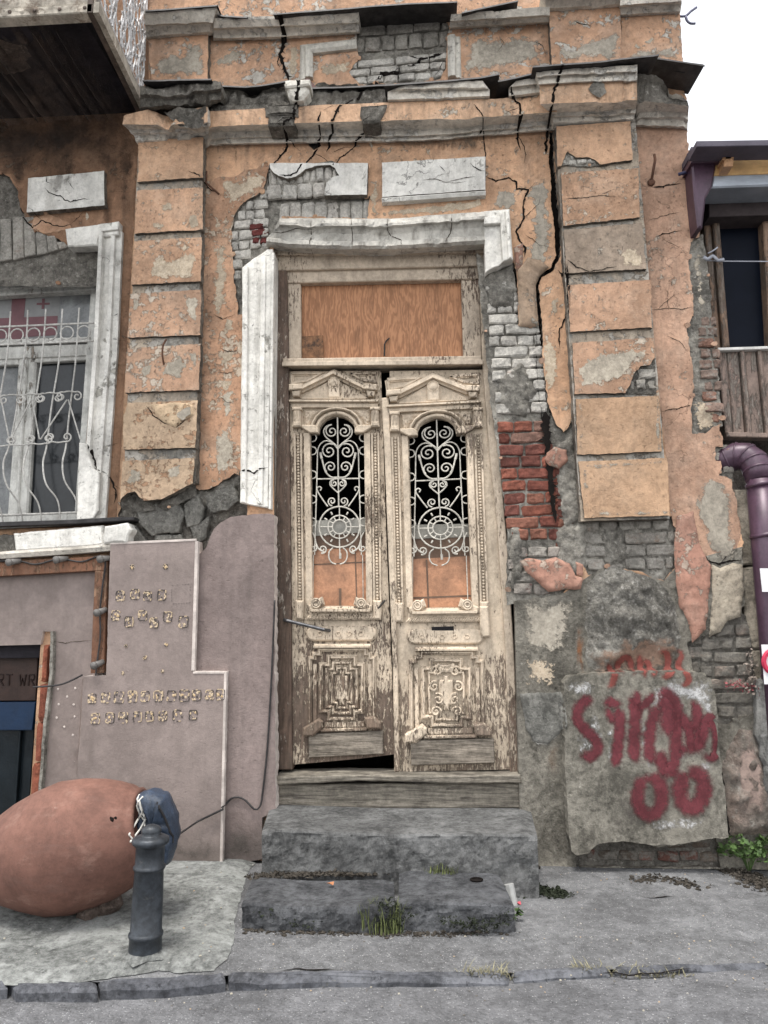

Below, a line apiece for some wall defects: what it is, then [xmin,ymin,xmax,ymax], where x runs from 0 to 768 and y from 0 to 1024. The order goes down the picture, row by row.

crack [267,12,444,176]
flaking render [321,22,449,85]
flaking render [0,171,98,287]
crack [22,178,85,228]
flaking render [213,160,515,334]
crack [426,41,617,523]
crack [654,291,691,310]
flaking render [119,430,250,550]
flaking render [476,234,757,725]
flaking render [576,838,719,869]